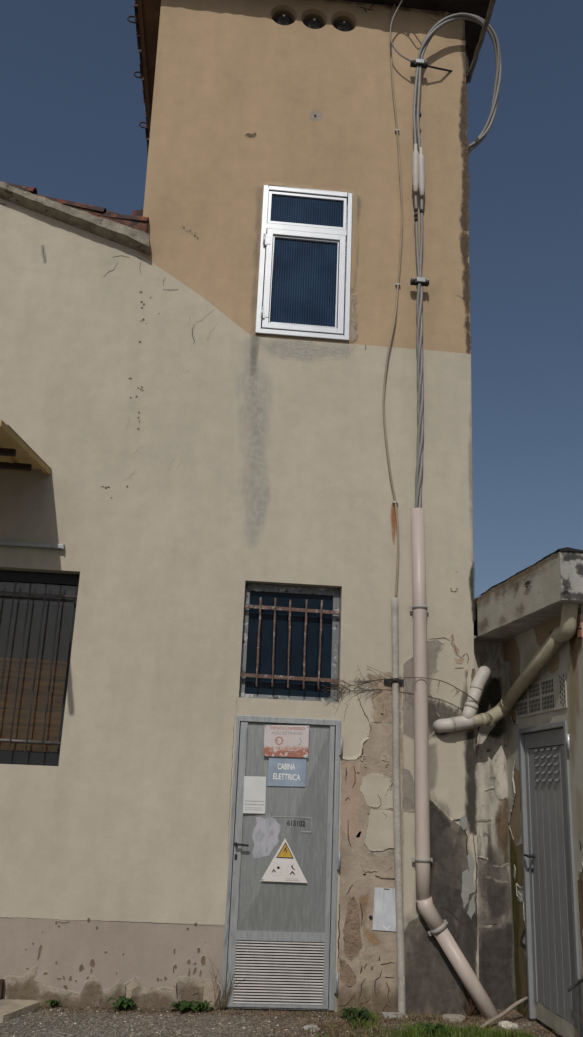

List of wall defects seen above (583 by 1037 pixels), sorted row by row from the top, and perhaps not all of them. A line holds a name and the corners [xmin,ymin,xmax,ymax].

peeling [427,633,489,740]
water stain [469,555,556,629]
peeling [503,637,522,688]
peeling [534,614,561,648]
spalling [548,607,582,675]
peeling [337,654,415,1013]
water stain [428,678,515,1010]
peeling [508,759,530,1020]
spalling [2,930,221,1009]
water stain [404,915,477,1015]